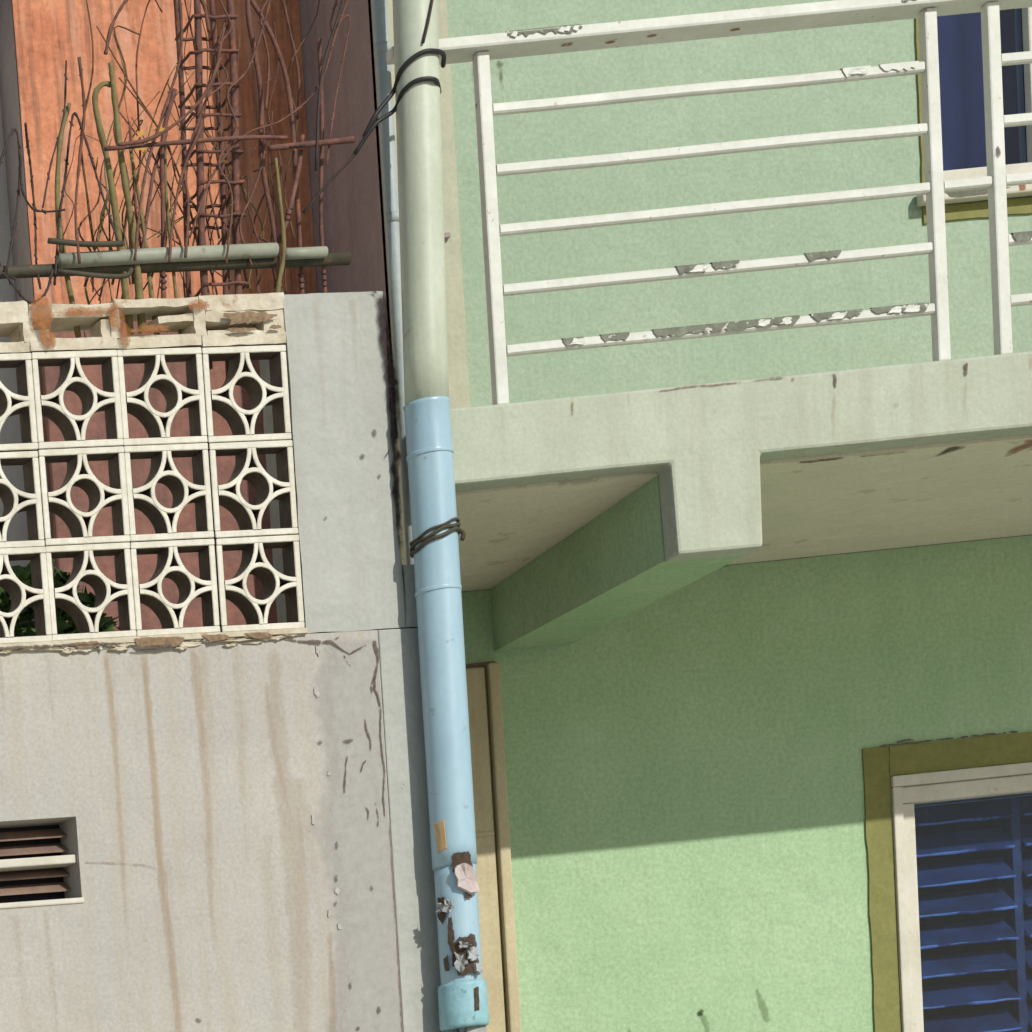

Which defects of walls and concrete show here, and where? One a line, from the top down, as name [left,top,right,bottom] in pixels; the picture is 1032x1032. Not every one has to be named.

peeling [506,24,582,37]
peeling [946,188,988,197]
peeling [804,250,842,261]
peeling [673,260,740,275]
corrosion [189,299,209,310]
corrosion [30,294,168,349]
peeling [651,302,929,338]
peeling [560,336,585,347]
peeling [599,332,630,342]
spalling [0,632,304,655]
crack [283,637,403,1032]